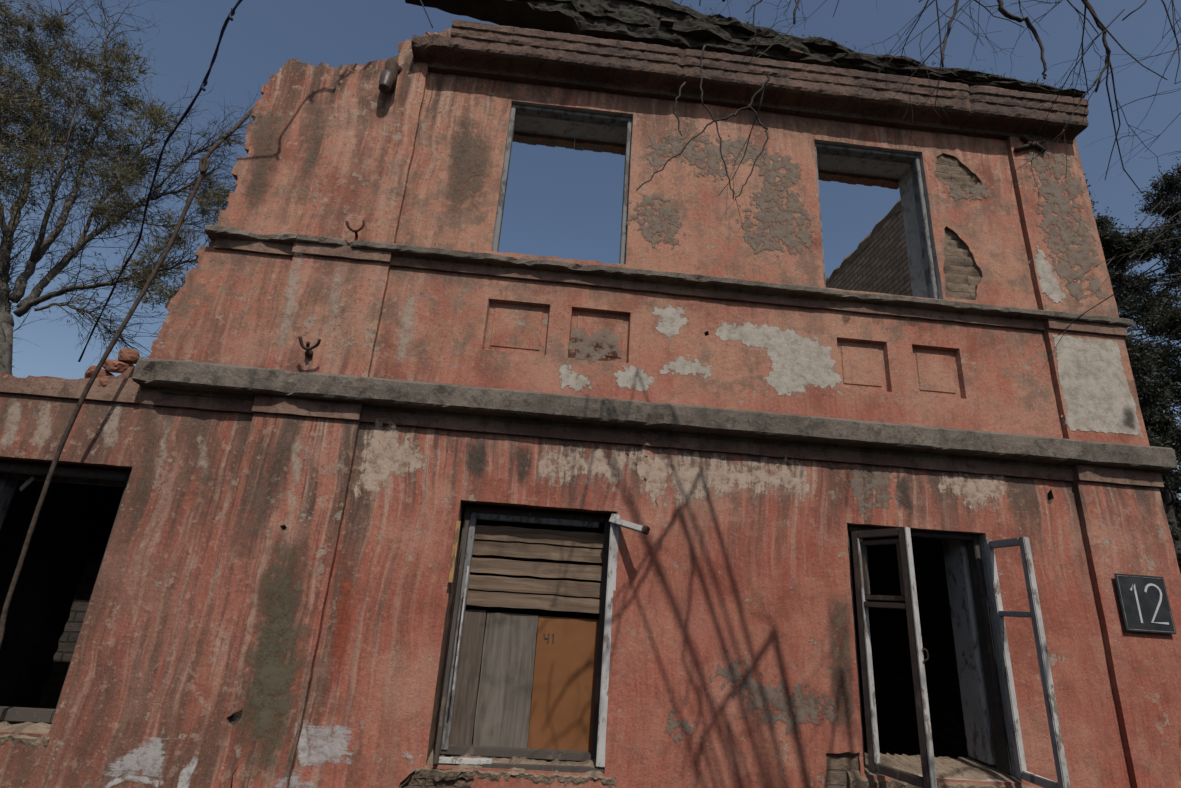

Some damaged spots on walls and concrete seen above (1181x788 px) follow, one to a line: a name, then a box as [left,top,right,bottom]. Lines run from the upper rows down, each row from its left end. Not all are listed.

peeling [626,192,687,249]
peeling [646,126,817,257]
peeling [704,320,842,396]
peeling [1052,335,1141,435]
peeling [538,445,810,508]
damp [247,541,306,765]
peeling [702,647,842,742]